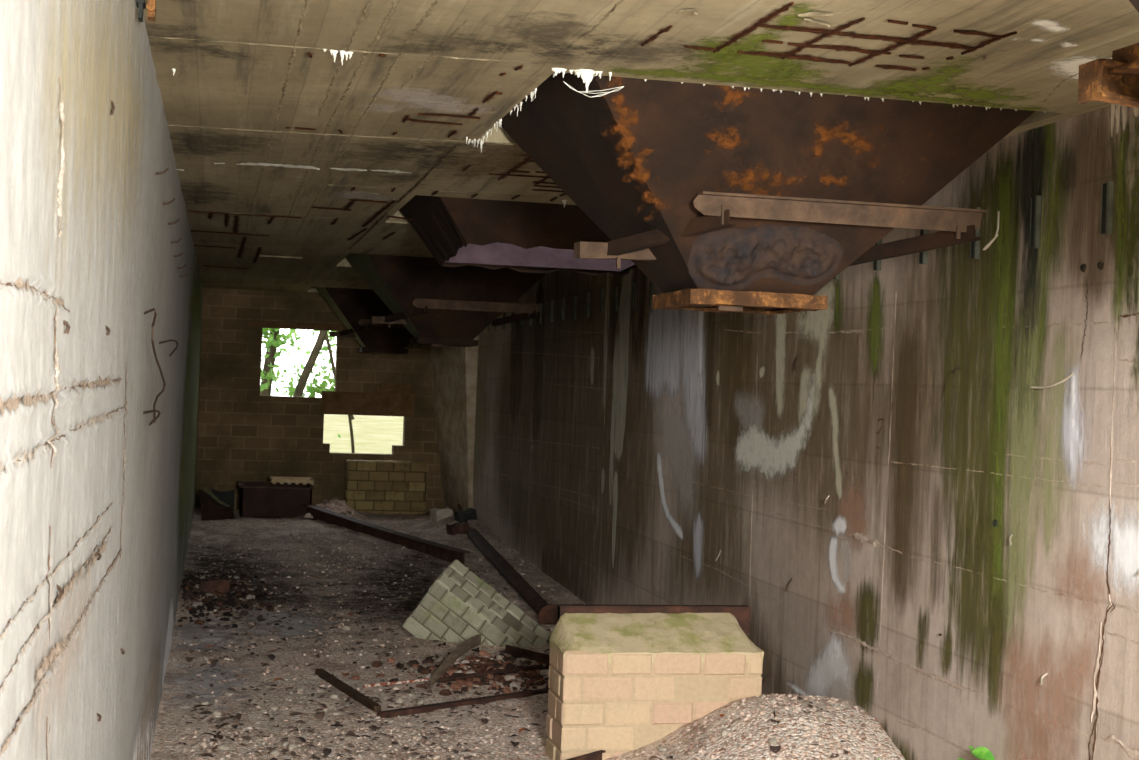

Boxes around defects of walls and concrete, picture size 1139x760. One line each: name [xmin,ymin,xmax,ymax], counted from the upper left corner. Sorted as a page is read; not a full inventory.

corrosion [613,77,662,209]
damp [1016,126,1046,325]
damp [1060,104,1139,294]
damp [473,269,878,600]
damp [894,279,935,596]
damp [1063,370,1083,479]
damp [750,623,848,697]
crack [1088,503,1115,760]
damp [1091,508,1139,589]